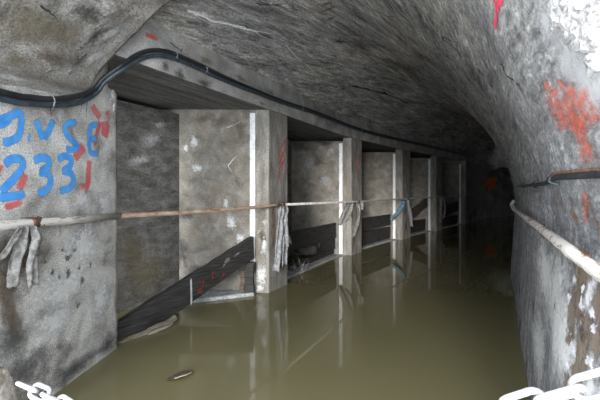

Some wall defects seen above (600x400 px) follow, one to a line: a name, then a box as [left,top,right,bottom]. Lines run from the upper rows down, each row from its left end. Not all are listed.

spalling [547,0,600,77]
peeling [564,262,600,387]